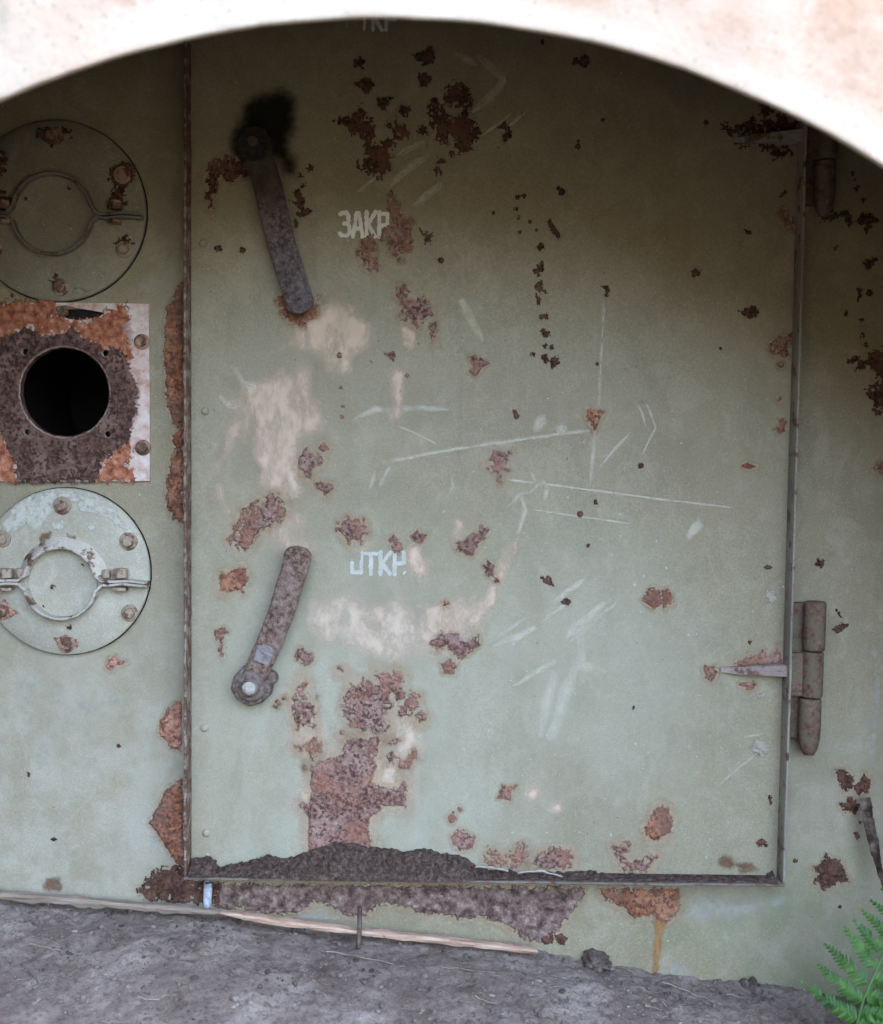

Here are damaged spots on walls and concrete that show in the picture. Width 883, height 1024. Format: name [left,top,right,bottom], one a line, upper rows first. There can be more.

corrosion [332,46,482,272]
corrosion [703,104,798,161]
corrosion [513,193,560,370]
corrosion [0,293,140,485]
corrosion [163,282,184,523]
corrosion [226,493,286,551]
corrosion [430,630,480,674]
corrosion [273,670,428,850]
corrosion [136,779,585,945]
corrosion [600,887,682,973]
corrosion [642,804,674,841]
corrosion [812,853,849,891]